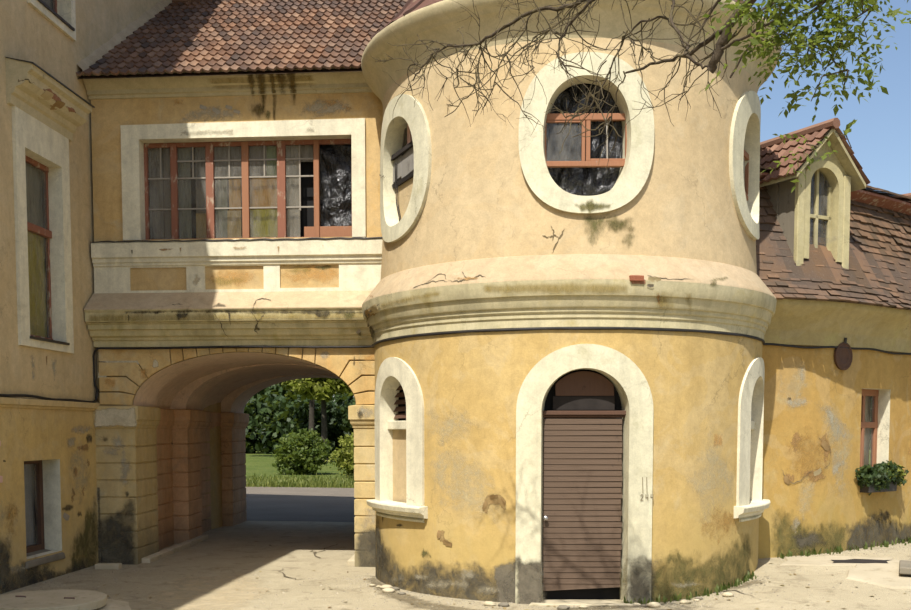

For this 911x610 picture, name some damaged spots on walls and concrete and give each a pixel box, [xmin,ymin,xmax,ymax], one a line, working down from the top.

leakage [216,73,311,120]
leakage [580,200,632,244]
crack [414,272,486,288]
crack [252,298,271,334]
peeling [782,409,848,485]
spalling [482,494,506,514]
leakage [0,488,135,594]
leakage [358,510,545,604]
leakage [623,541,751,604]
leakage [775,511,911,556]